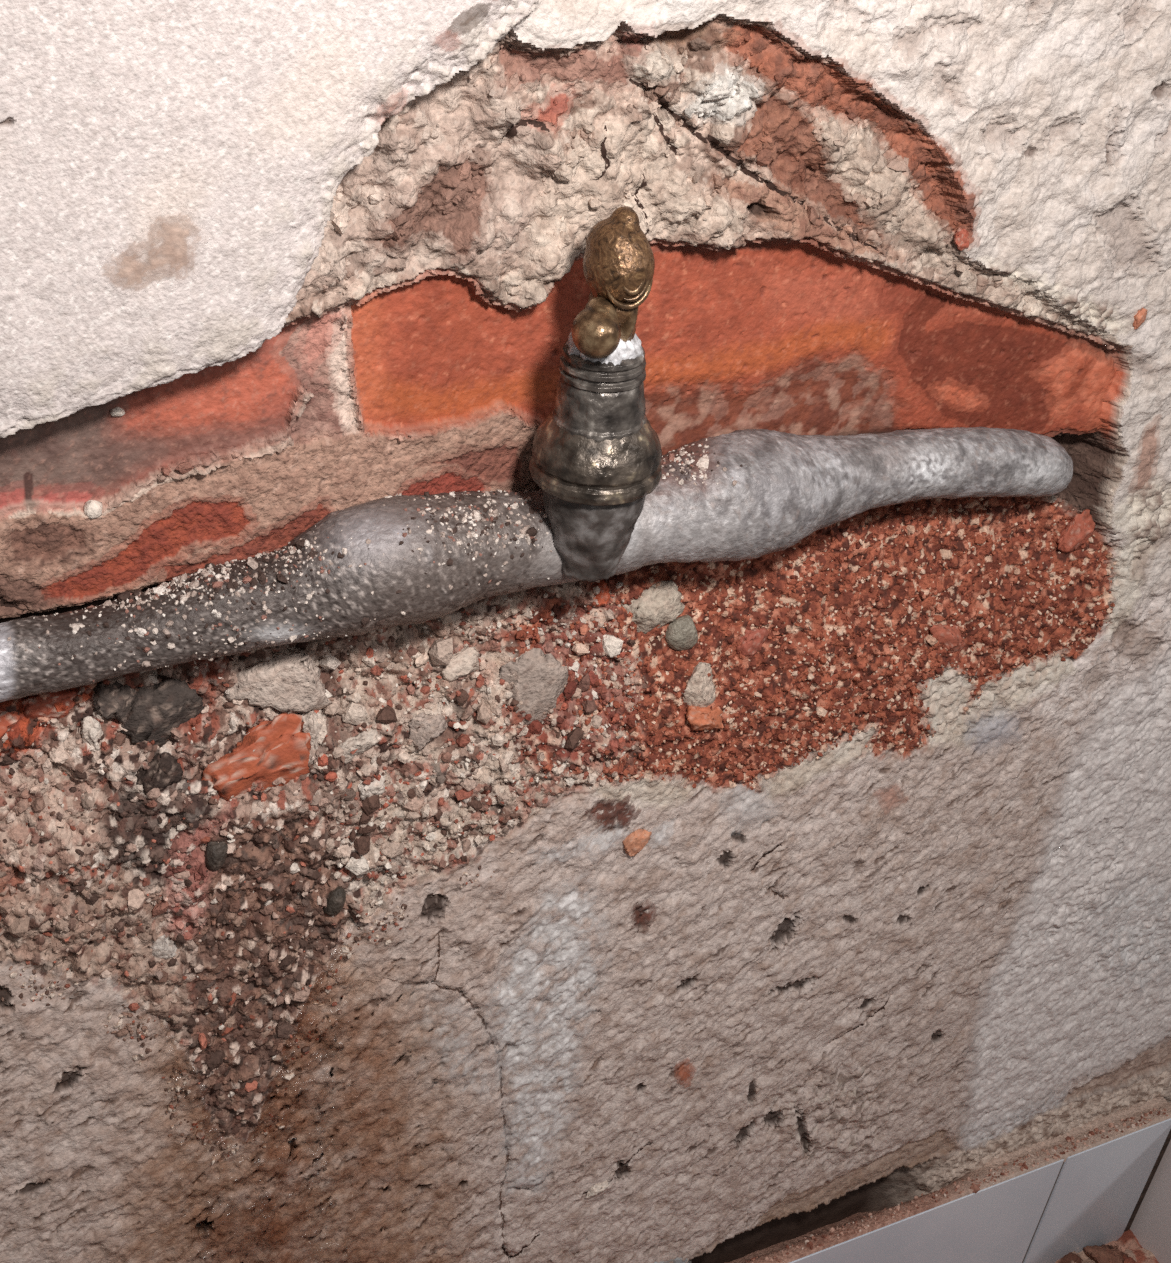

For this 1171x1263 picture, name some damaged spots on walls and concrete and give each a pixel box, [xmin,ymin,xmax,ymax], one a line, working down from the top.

peeling [448,4,488,34]
flaking render [0,14,1135,623]
crack [629,78,884,255]
spalling [0,496,1119,1152]
spalling [164,1065,241,1165]
crack [383,932,549,1263]